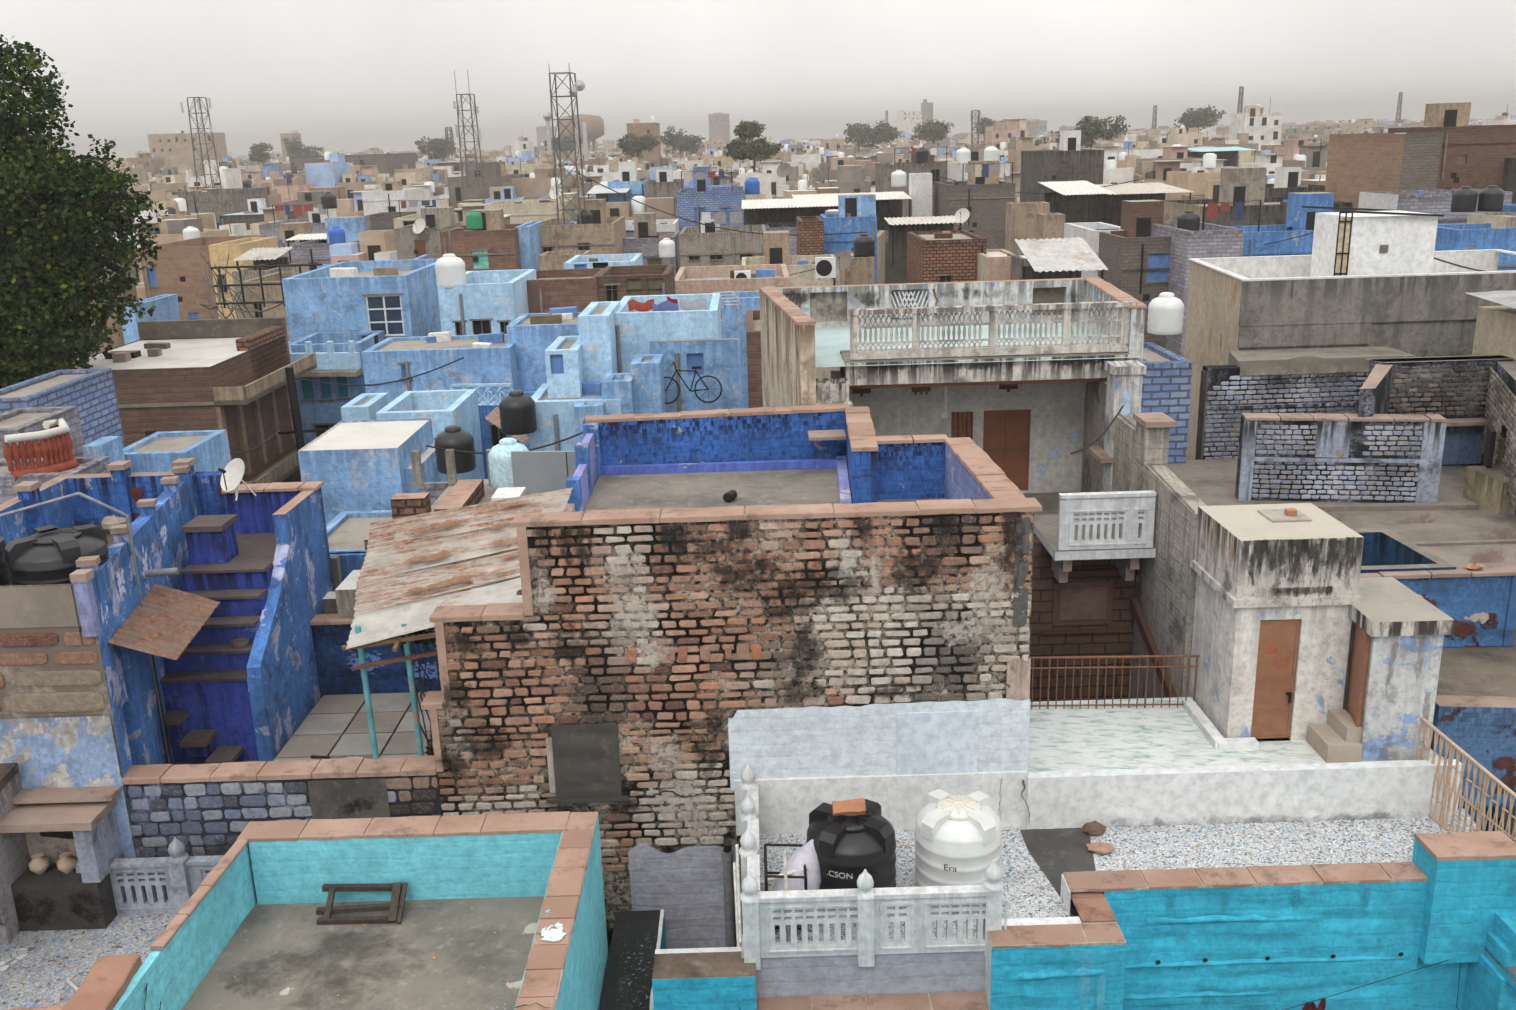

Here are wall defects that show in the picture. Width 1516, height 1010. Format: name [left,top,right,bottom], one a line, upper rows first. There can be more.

water stain [455,633,482,657]
water stain [507,623,589,668]
water stain [528,528,592,613]
water stain [611,551,670,666]
water stain [661,513,960,703]
water stain [935,512,1025,645]
water stain [1248,537,1359,596]
water stain [442,675,512,775]
water stain [556,716,728,838]
peeling [1493,756,1516,770]